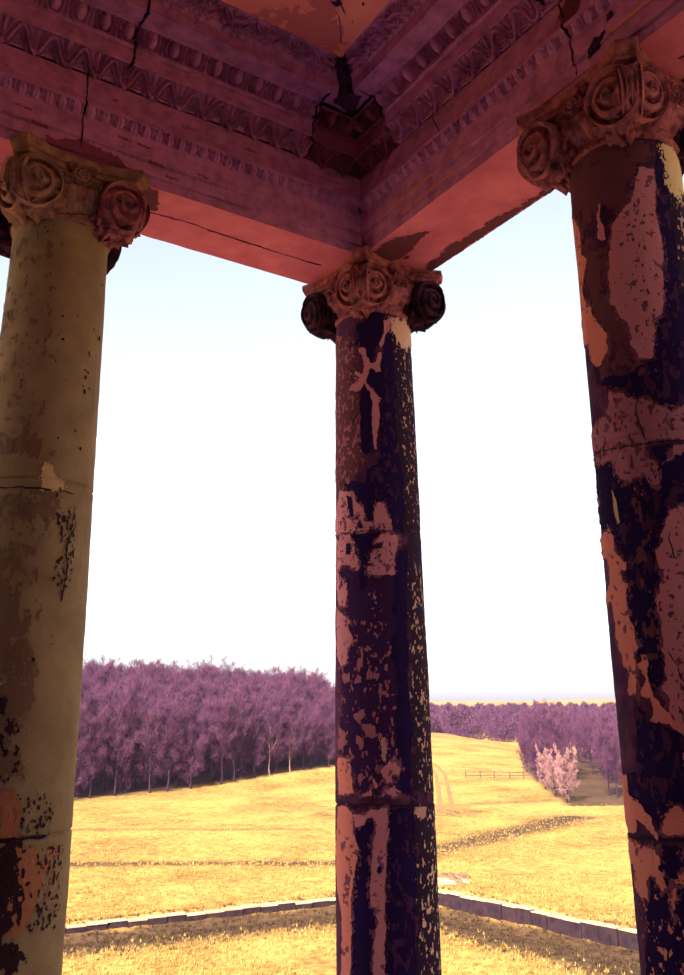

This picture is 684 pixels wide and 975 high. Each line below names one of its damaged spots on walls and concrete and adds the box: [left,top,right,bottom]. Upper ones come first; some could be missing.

crack [80,71,89,144]
crack [126,0,151,80]
crack [308,93,331,141]
crack [535,0,577,76]
peeling [572,219,608,367]
peeling [596,143,684,359]
crack [0,486,75,495]
crack [61,523,76,600]
peeling [335,491,398,683]
spalling [600,491,684,735]
peeling [335,708,401,975]
peeling [620,766,684,917]